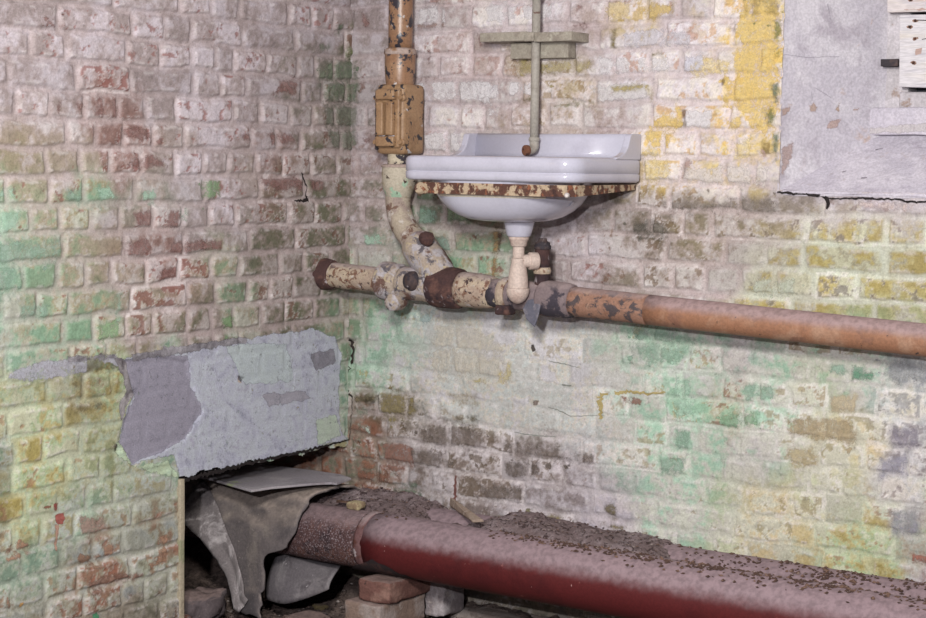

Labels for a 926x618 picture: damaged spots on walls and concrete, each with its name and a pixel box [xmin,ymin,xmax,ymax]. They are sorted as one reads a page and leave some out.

peeling [9,316,367,477]
spalling [358,443,413,490]